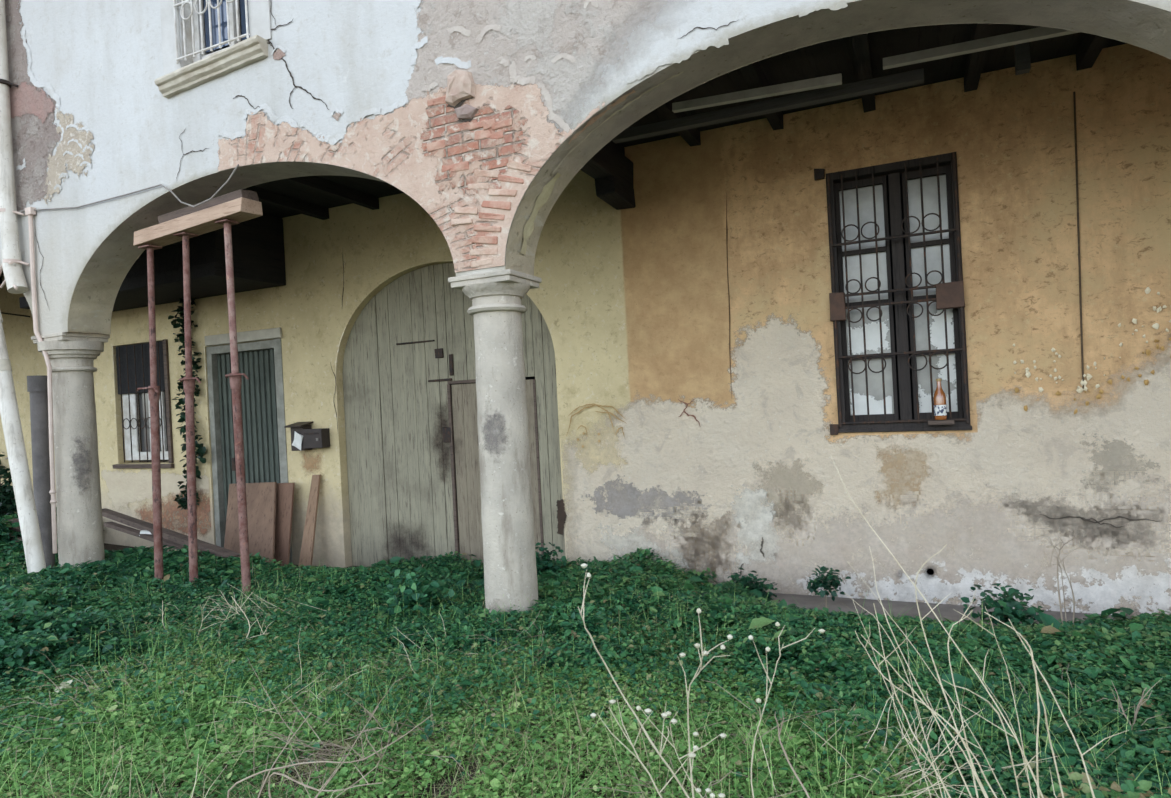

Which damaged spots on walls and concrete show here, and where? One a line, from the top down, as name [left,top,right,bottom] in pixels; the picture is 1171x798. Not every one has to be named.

peeling [5,0,94,211]
crack [267,8,329,110]
flaking render [217,0,729,272]
spalling [798,0,848,17]
water stain [434,410,450,480]
water stain [484,414,506,453]
peeling [556,287,1171,616]
water stain [575,426,1171,616]
crack [1039,514,1159,528]